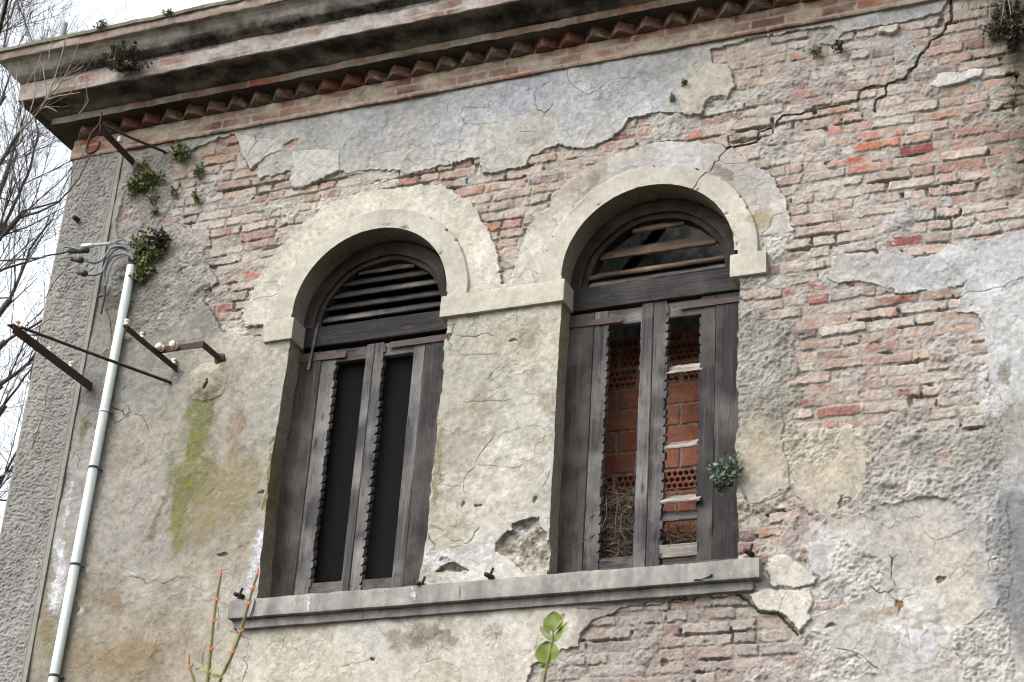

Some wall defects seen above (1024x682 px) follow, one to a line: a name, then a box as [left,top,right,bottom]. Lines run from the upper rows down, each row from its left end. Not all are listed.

crack [692,1,953,191]
spalling [175,0,1024,431]
spalling [437,559,469,572]
spalling [496,516,551,572]
spalling [527,508,819,682]